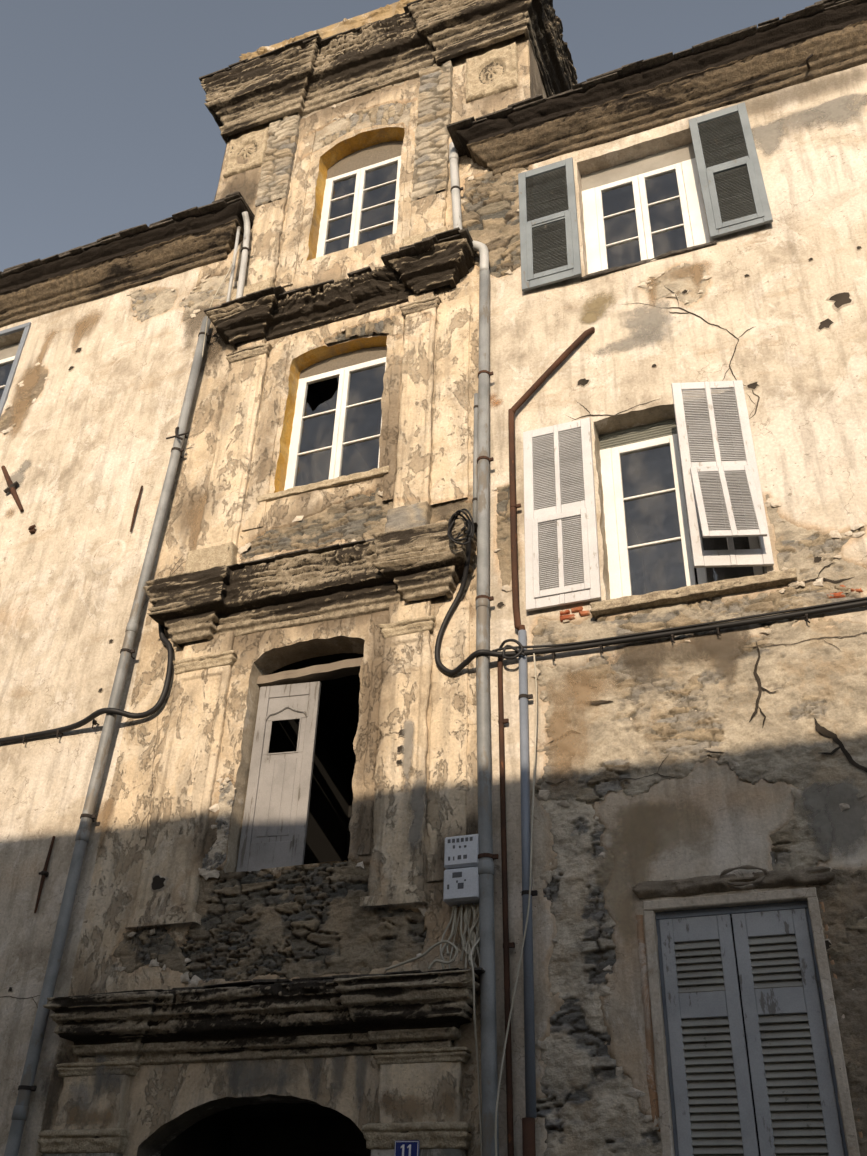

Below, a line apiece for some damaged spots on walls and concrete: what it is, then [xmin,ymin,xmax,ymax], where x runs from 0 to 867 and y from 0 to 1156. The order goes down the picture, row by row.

crack [620,286,760,419]
spalling [238,488,393,560]
spalling [430,502,473,524]
crack [741,632,867,728]
crack [814,718,867,772]
spalling [528,494,867,1156]
spalling [113,777,427,987]